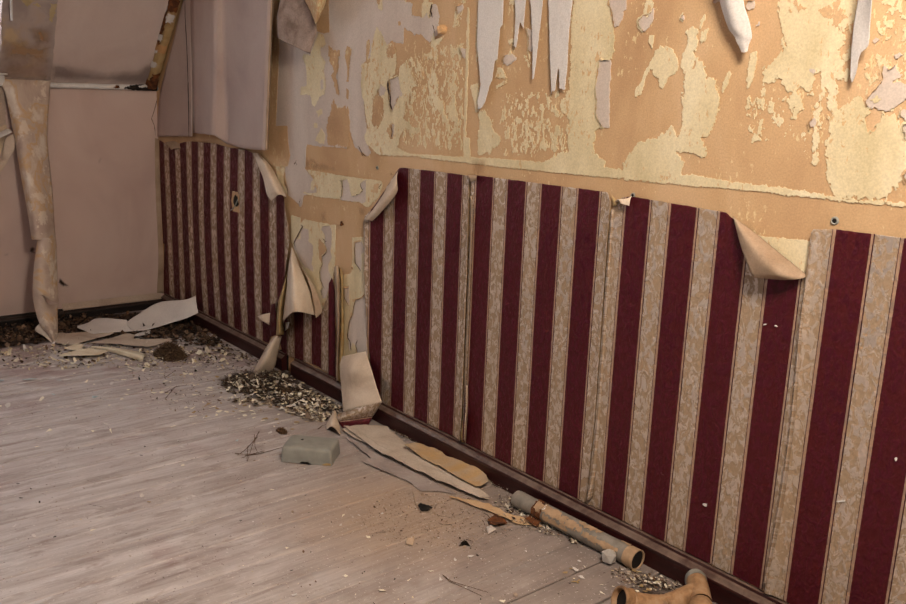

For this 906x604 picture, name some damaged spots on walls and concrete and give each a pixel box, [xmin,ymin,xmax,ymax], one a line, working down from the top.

peeling [0,0,58,160]
flaking render [253,0,906,382]